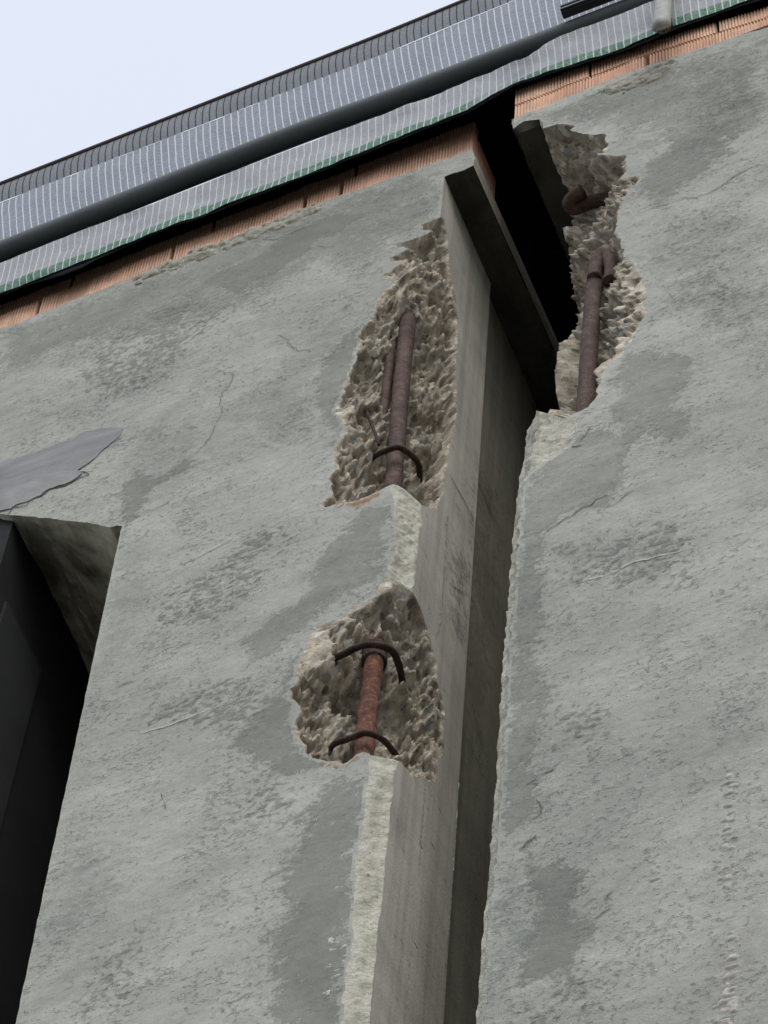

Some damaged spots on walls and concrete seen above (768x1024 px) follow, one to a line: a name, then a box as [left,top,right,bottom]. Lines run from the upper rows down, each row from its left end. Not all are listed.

spalling [290,217,458,1024]
spalling [476,119,648,1024]